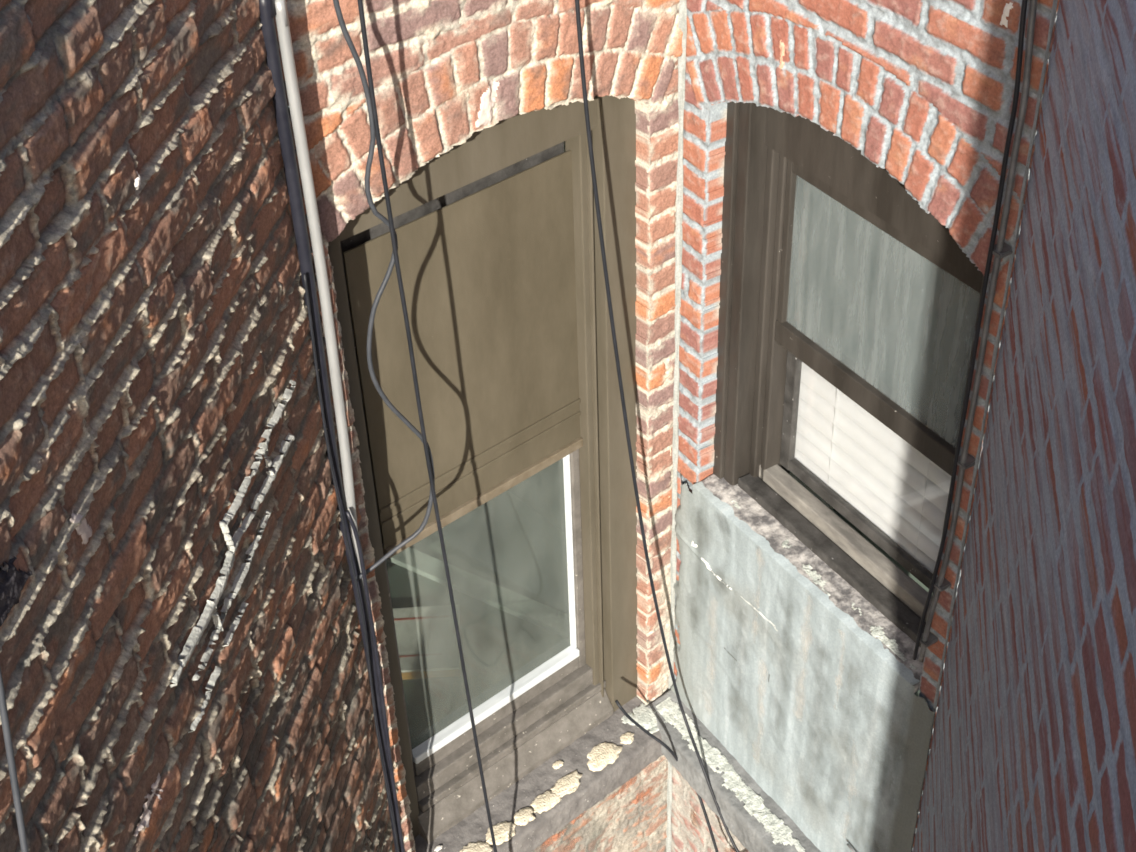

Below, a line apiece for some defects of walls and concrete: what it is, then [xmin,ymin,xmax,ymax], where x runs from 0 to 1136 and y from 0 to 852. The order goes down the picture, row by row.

spalling [0,556,33,627]
spalling [613,780,651,805]